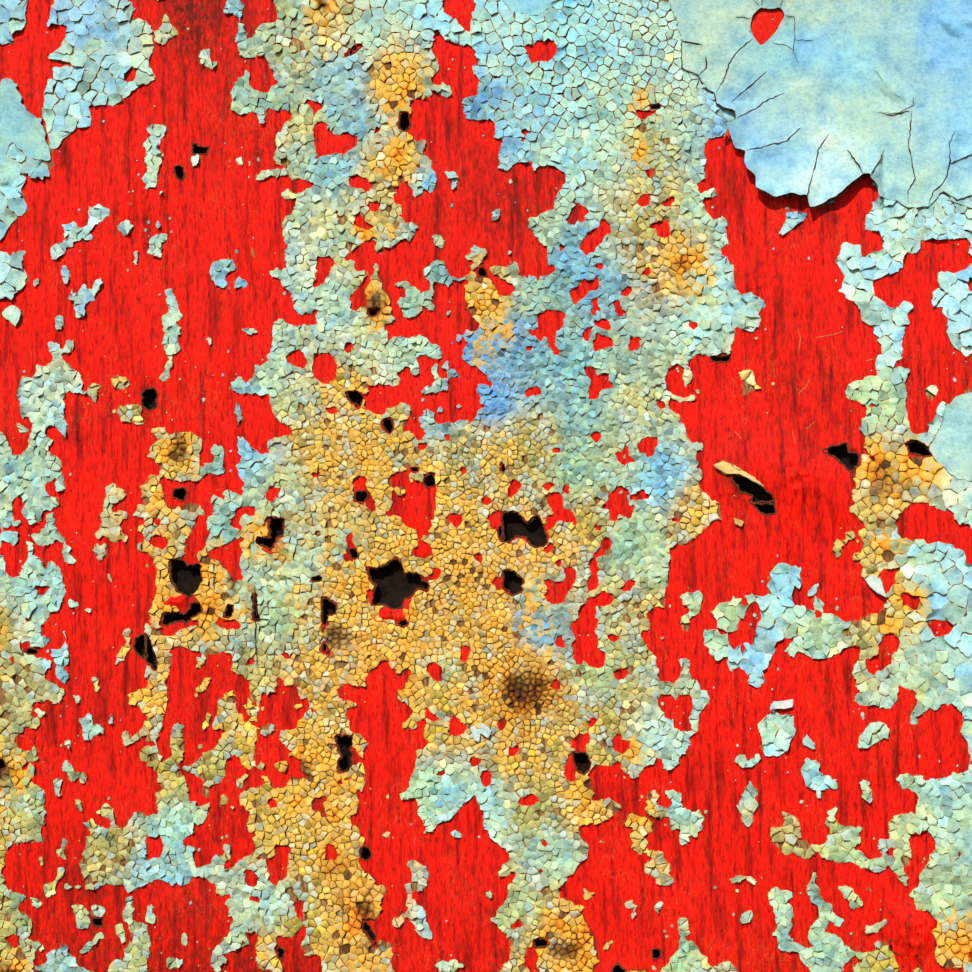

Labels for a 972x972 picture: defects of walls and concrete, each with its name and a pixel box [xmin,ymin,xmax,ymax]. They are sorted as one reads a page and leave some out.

crack [681,0,814,122]
crack [748,128,800,150]
crack [807,134,829,204]
crack [847,150,884,175]
crack [876,71,972,209]
peeling [0,0,766,972]
peeling [680,183,972,972]